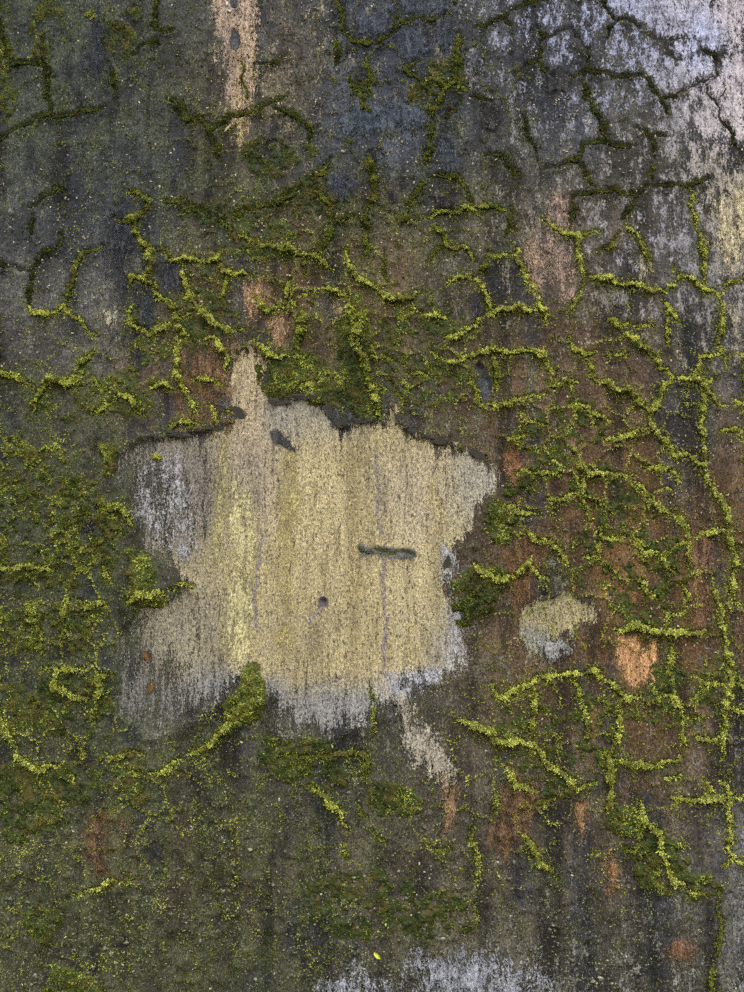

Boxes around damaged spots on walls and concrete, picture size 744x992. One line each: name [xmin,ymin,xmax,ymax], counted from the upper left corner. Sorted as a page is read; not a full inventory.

peeling [509,34,622,153]
crack [596,0,687,60]
peeling [596,7,744,173]
peeling [4,190,127,335]
peeling [124,131,451,328]
crack [0,0,579,447]
peeling [109,340,513,749]
peeling [507,576,601,654]
peeling [574,435,729,565]
leakage [314,943,569,992]